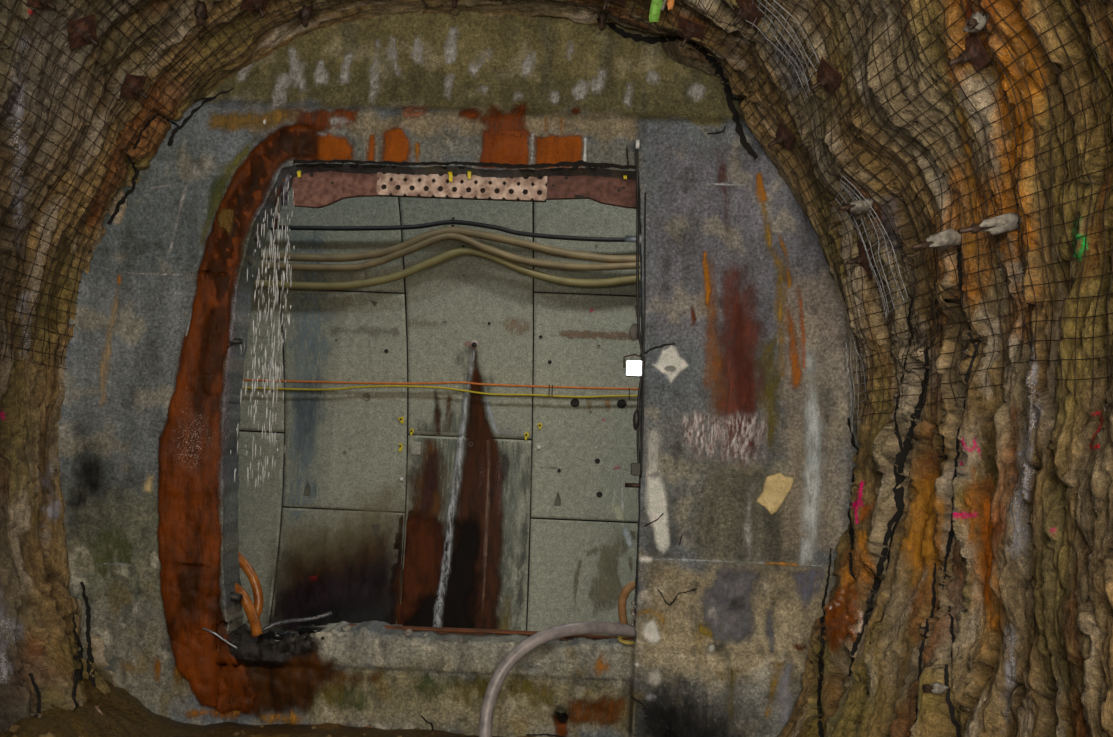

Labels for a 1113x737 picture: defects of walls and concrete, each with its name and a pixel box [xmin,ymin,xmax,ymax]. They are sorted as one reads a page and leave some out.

efflorescence [257,49,352,109]
rust [367,106,426,162]
efflorescence [445,28,456,96]
rust [459,105,582,169]
efflorescence [572,71,605,99]
crack [597,18,758,160]
efflorescence [689,84,705,99]
rust [683,173,806,461]
rust [157,108,378,724]
damp [275,235,392,632]
rust [394,342,530,630]
crack [817,249,981,737]